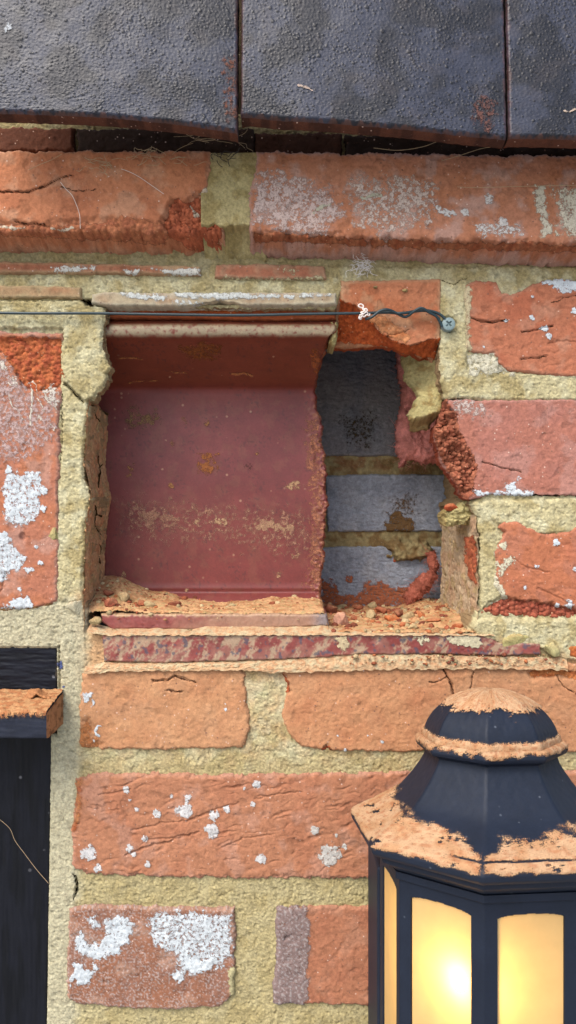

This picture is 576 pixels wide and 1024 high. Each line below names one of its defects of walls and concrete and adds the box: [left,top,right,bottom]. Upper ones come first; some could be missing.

crack [0,175,95,193]
spalling [0,198,222,252]
crack [475,295,576,333]
spalling [0,336,64,392]
spalling [314,299,441,409]
damp [0,356,59,582]
spalling [433,399,478,501]
damp [1,587,33,610]
spalling [483,598,576,618]
damp [69,909,237,997]